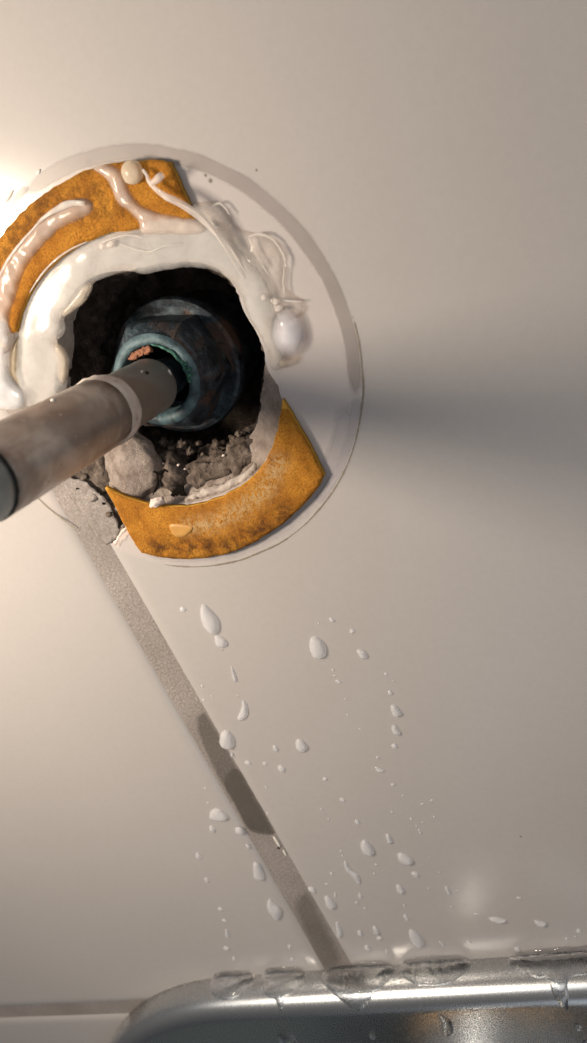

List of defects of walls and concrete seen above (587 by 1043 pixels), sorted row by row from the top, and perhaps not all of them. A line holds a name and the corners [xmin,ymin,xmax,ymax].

hole [63,262,241,390]
spalling [61,344,282,546]